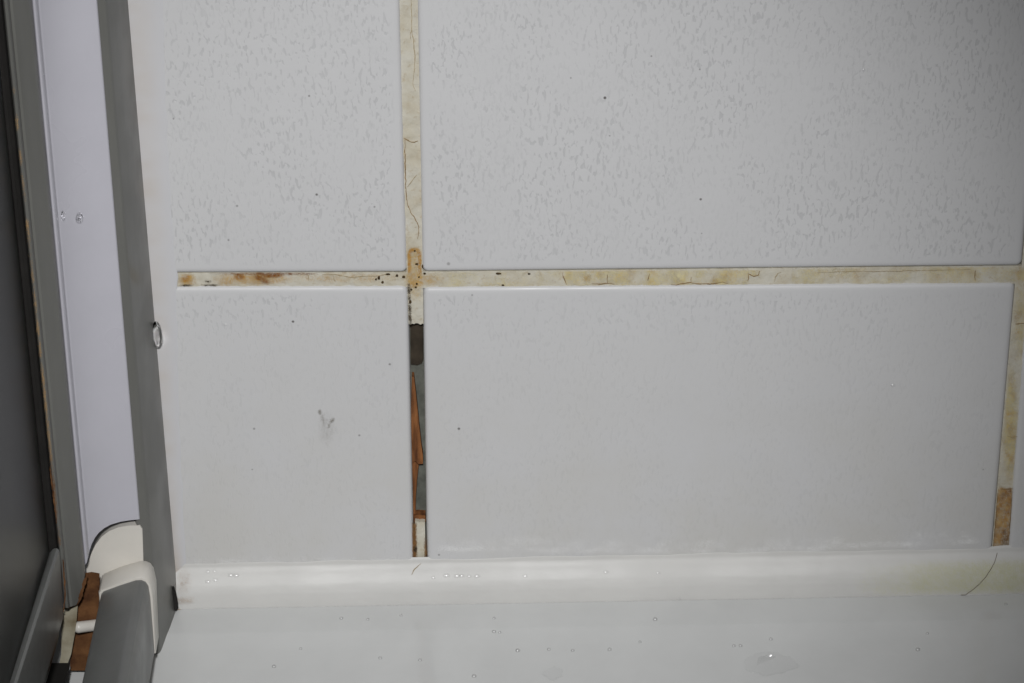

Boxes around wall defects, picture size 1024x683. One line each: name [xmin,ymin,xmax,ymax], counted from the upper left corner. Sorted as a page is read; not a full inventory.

crack [404,138,419,239]
corrosion [179,248,443,298]
water stain [375,250,759,325]
crack [648,271,781,285]
water stain [412,267,1024,596]